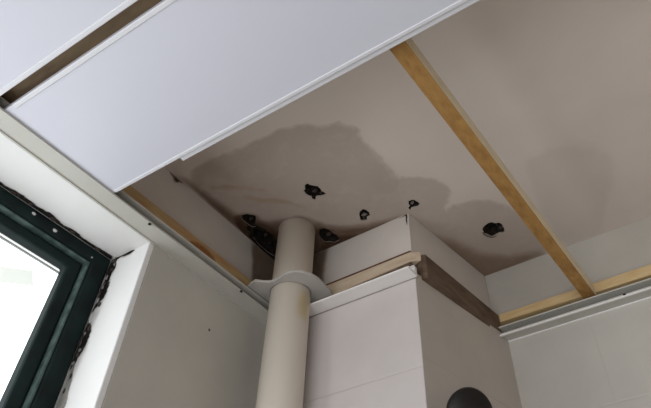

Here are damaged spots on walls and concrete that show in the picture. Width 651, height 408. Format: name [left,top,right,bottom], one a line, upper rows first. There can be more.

leakage [189,119,548,280]